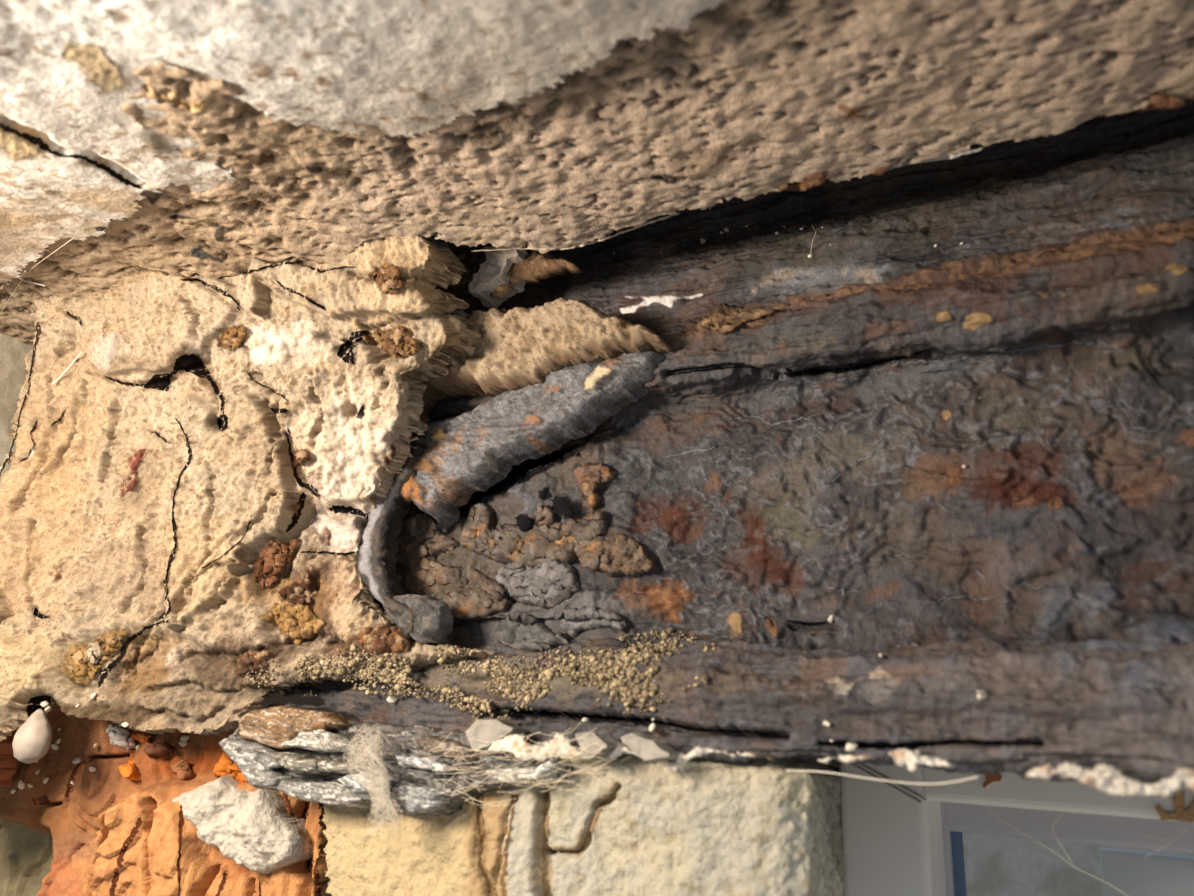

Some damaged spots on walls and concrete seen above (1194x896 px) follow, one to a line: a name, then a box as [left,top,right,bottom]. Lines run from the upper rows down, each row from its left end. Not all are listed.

crack [0,122,141,189]
spalling [0,0,1194,348]
rust [763,172,827,194]
crack [180,261,355,311]
rust [935,311,992,330]
crack [98,417,192,688]
flaking render [0,235,496,787]
crack [247,372,369,555]
rust [402,458,433,502]
spalling [458,448,583,518]
spalling [515,514,533,532]
rust [356,624,411,655]